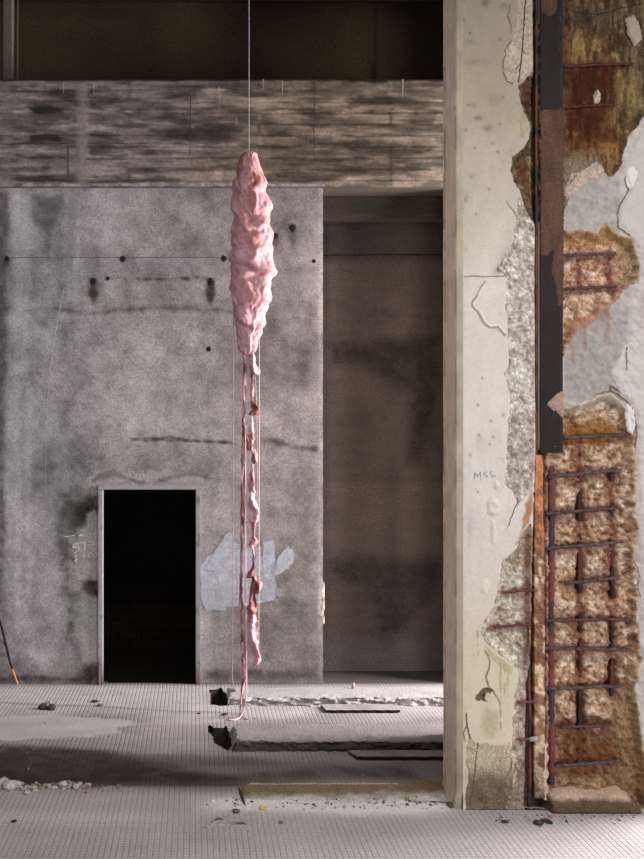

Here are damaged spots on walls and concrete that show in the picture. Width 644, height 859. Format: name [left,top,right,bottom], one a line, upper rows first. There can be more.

crack [464,275,506,336]
spalling [499,0,644,825]
crack [484,650,501,706]
spalling [465,524,533,823]
corrosion [523,455,545,798]